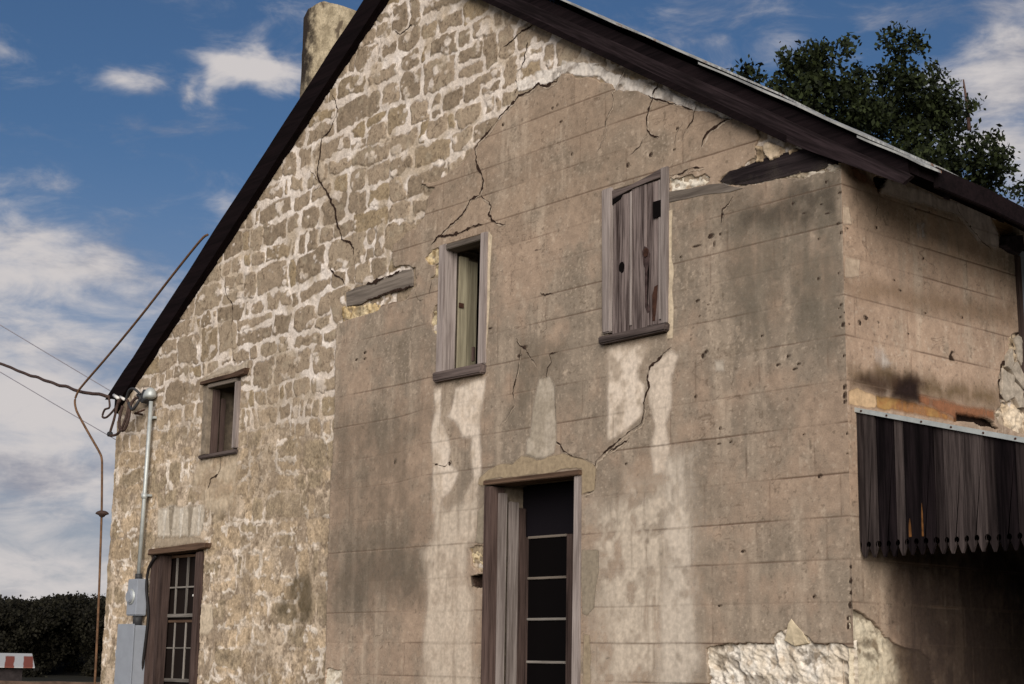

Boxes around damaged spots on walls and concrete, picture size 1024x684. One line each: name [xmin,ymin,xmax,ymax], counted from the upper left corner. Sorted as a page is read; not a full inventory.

crack [310,97,354,254]
crack [433,25,562,242]
crack [631,83,731,179]
spalling [670,176,709,191]
spalling [786,163,841,183]
crack [502,338,556,425]
crack [556,348,672,496]
corrosion [877,395,994,419]
spalling [954,334,1024,434]
damp [421,378,486,684]
damp [592,344,699,684]
spalling [707,565,921,684]